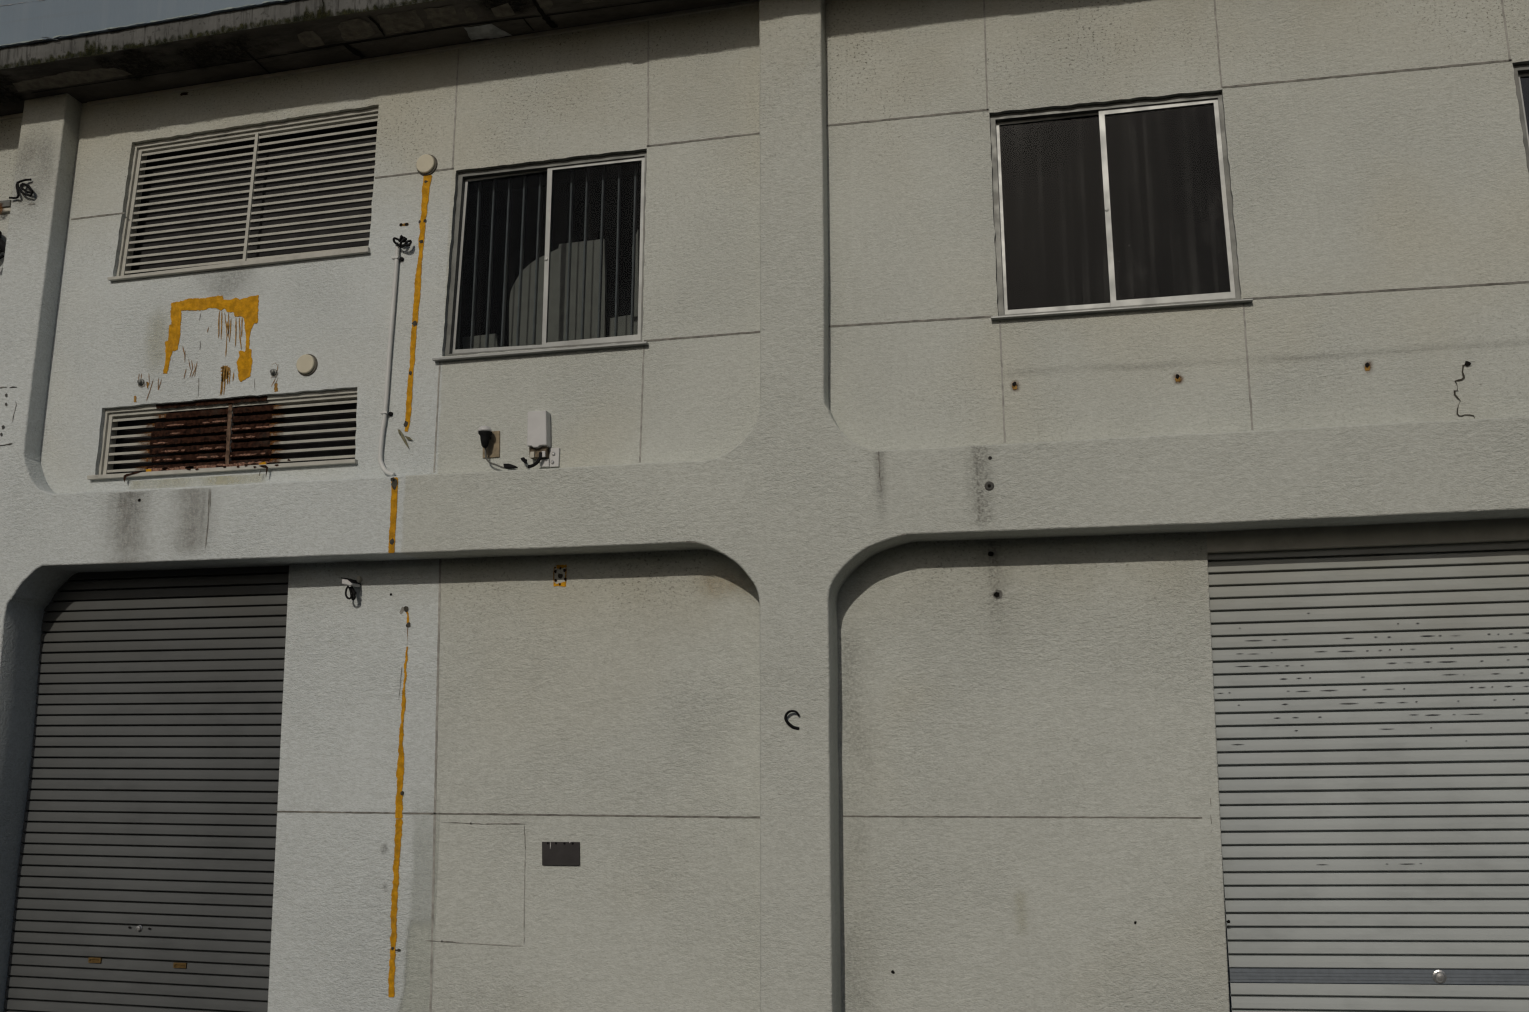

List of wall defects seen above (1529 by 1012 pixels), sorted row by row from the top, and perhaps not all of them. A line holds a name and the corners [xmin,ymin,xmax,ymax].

crack [1454,361,1475,418]
corrosion [123,395,291,482]